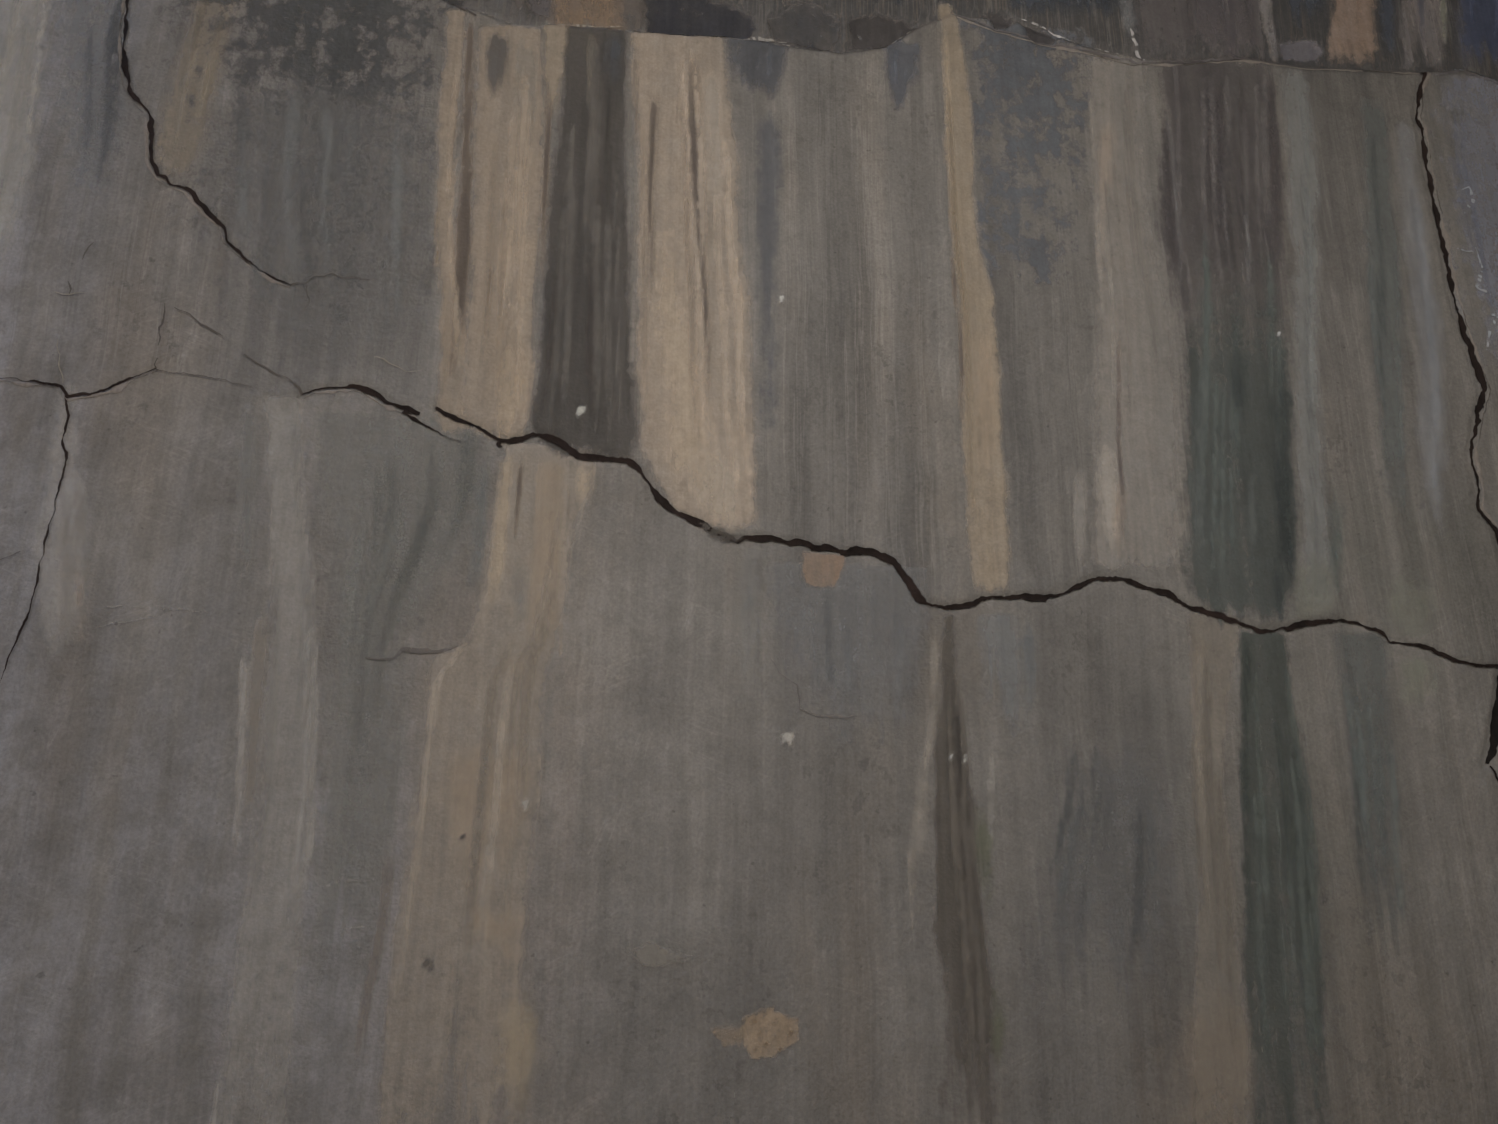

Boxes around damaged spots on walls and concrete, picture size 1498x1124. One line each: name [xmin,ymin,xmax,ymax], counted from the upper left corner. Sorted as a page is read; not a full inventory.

crack [117,0,369,311]
damp [885,41,920,108]
damp [939,0,1329,604]
crack [957,15,1498,542]
crack [0,304,1498,780]
damp [775,563,921,737]
damp [933,615,995,1124]
damp [1041,746,1174,972]
peeling [741,1008,799,1059]